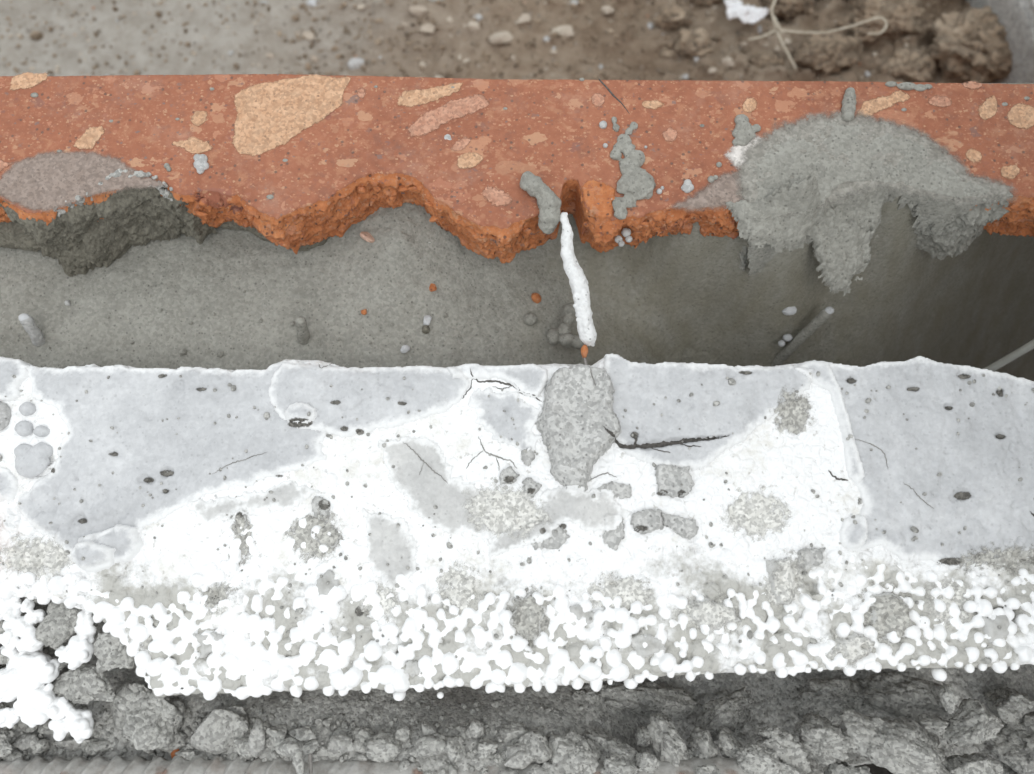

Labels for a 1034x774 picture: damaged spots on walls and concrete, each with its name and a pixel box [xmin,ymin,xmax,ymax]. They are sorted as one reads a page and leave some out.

spalling [189,196,315,249]
spalling [334,186,447,234]
spalling [465,221,532,258]
spalling [581,179,618,247]
spalling [634,212,736,246]
crack [604,426,727,453]
water stain [228,511,253,566]
water stain [285,509,343,563]
water stain [721,486,791,538]
water stain [924,542,1034,625]
water stain [507,589,550,645]
water stain [826,582,912,664]